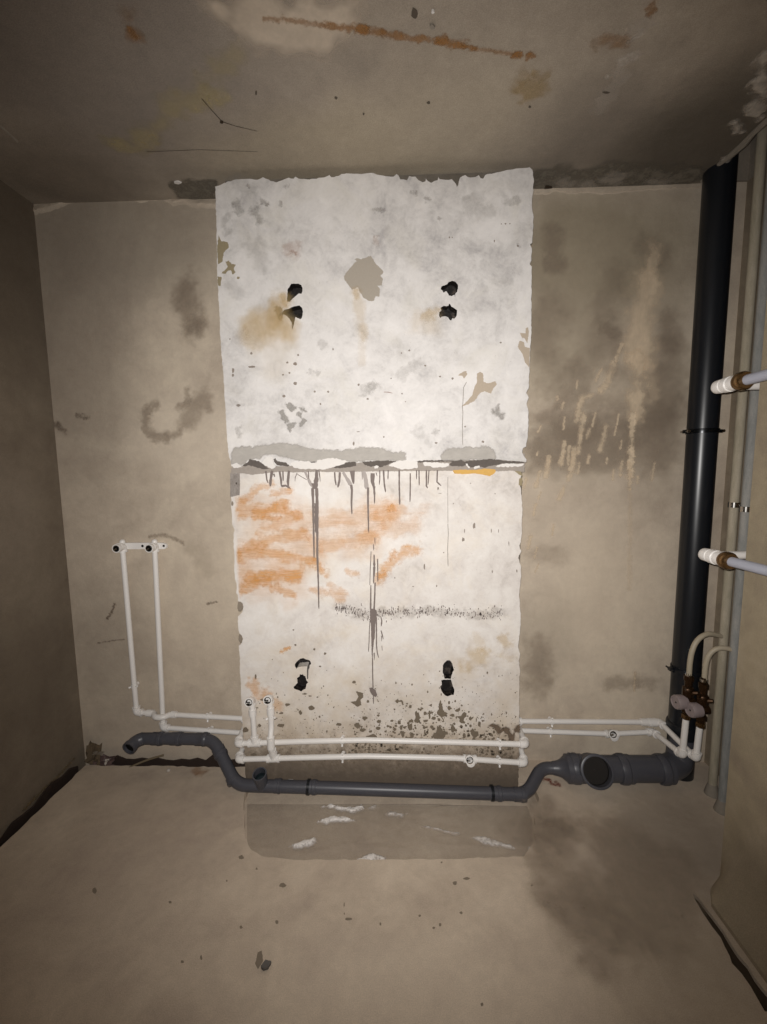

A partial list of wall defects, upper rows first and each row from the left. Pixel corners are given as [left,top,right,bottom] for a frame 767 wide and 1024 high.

corrosion [327,22,478,51]
peeling [344,256,383,301]
peeling [439,371,497,406]
water stain [524,259,660,516]
water stain [265,470,320,608]
water stain [334,470,503,704]
water stain [490,724,520,741]